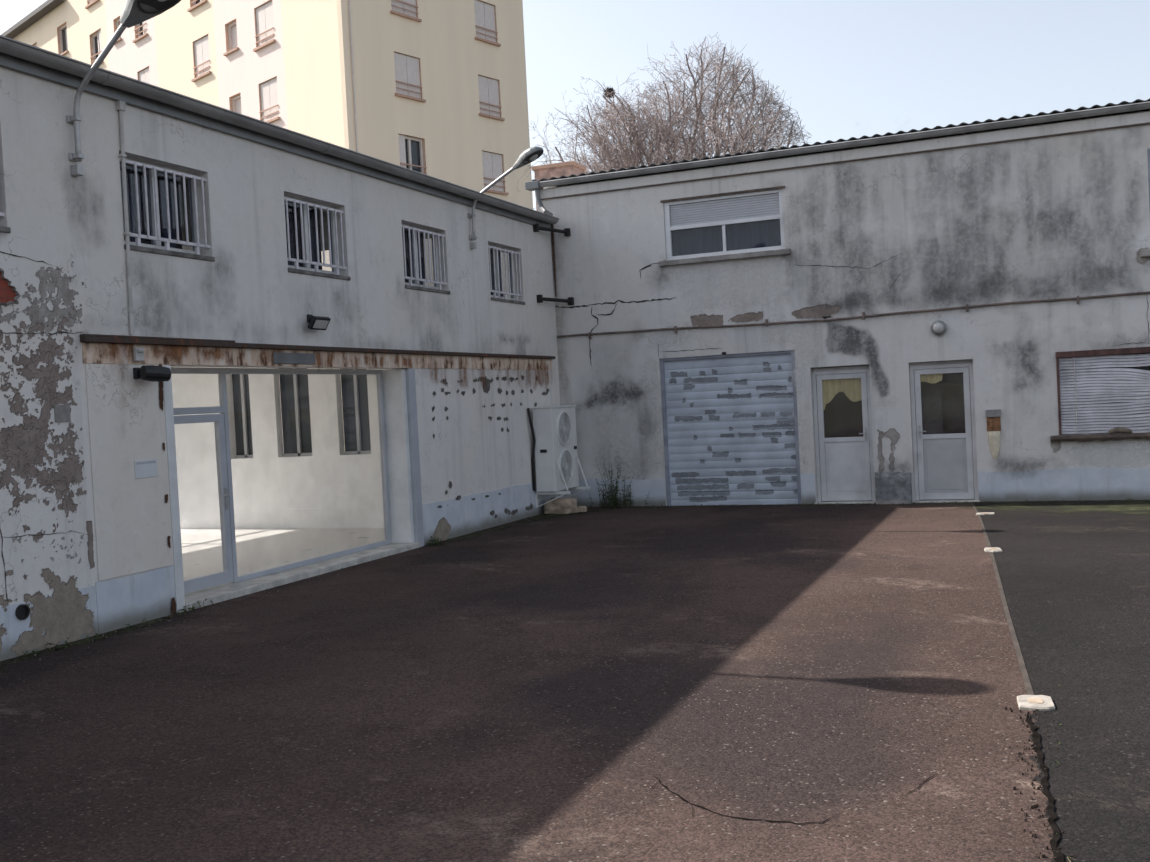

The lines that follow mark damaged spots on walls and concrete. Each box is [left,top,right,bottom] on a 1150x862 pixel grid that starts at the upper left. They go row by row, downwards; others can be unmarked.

crack [555,263,677,362]
spalling [690,311,764,326]
spalling [792,303,841,319]
rust [154,345,223,366]
water stain [832,327,889,402]
peeling [432,375,549,438]
peeling [0,261,95,656]
peeling [877,428,900,473]
peeling [433,481,502,543]
peeling [490,503,533,518]
crack [0,529,88,606]